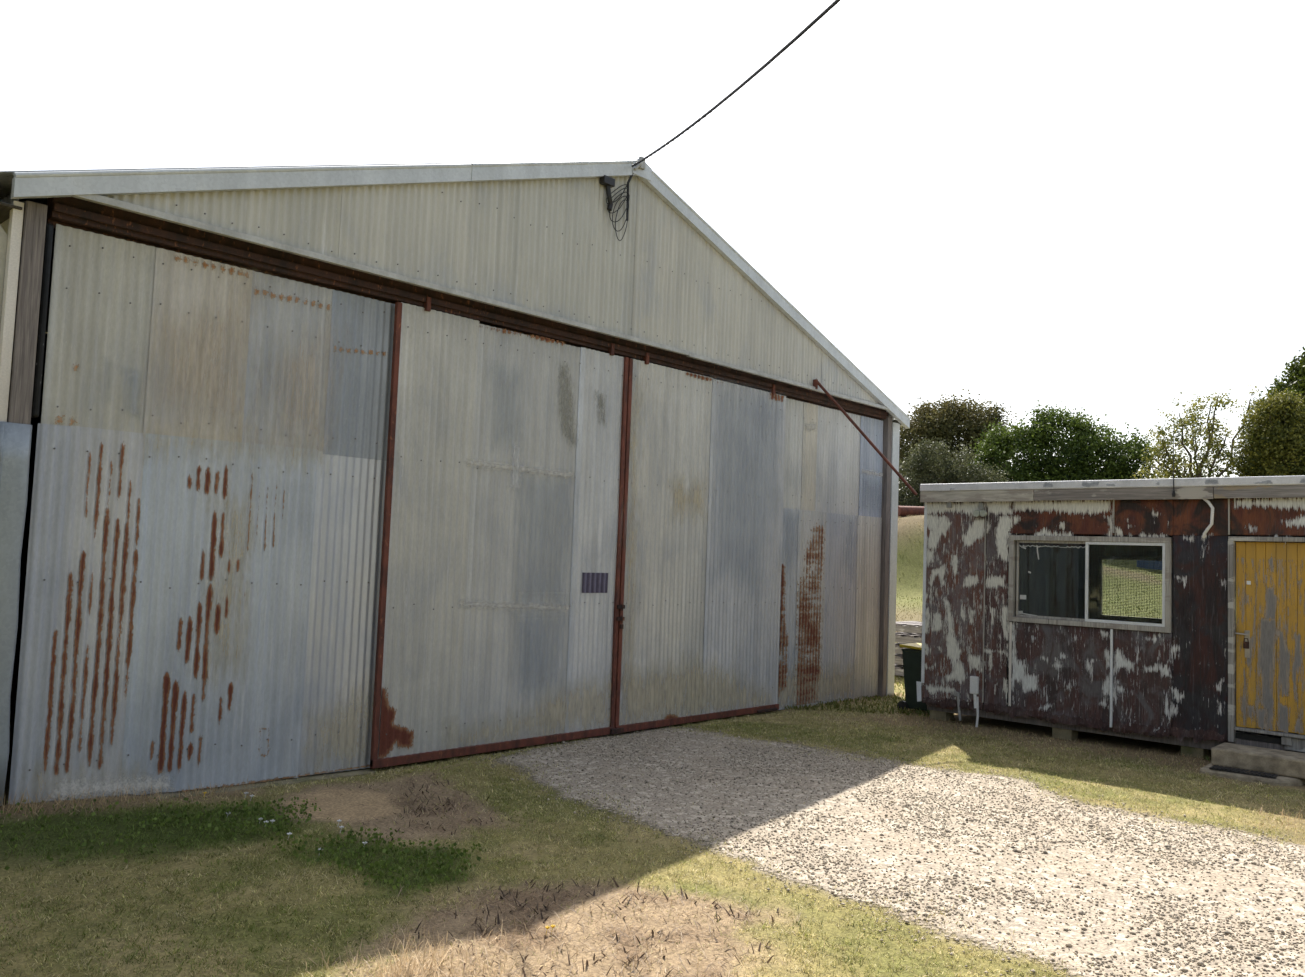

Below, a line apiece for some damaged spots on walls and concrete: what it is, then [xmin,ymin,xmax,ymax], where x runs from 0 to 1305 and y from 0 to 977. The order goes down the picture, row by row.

rust [44,442,140,775]
rust [150,465,285,774]
rust [182,687,414,792]
rust [778,524,826,706]
peeling [921,482,1190,732]
peeling [1203,478,1305,734]